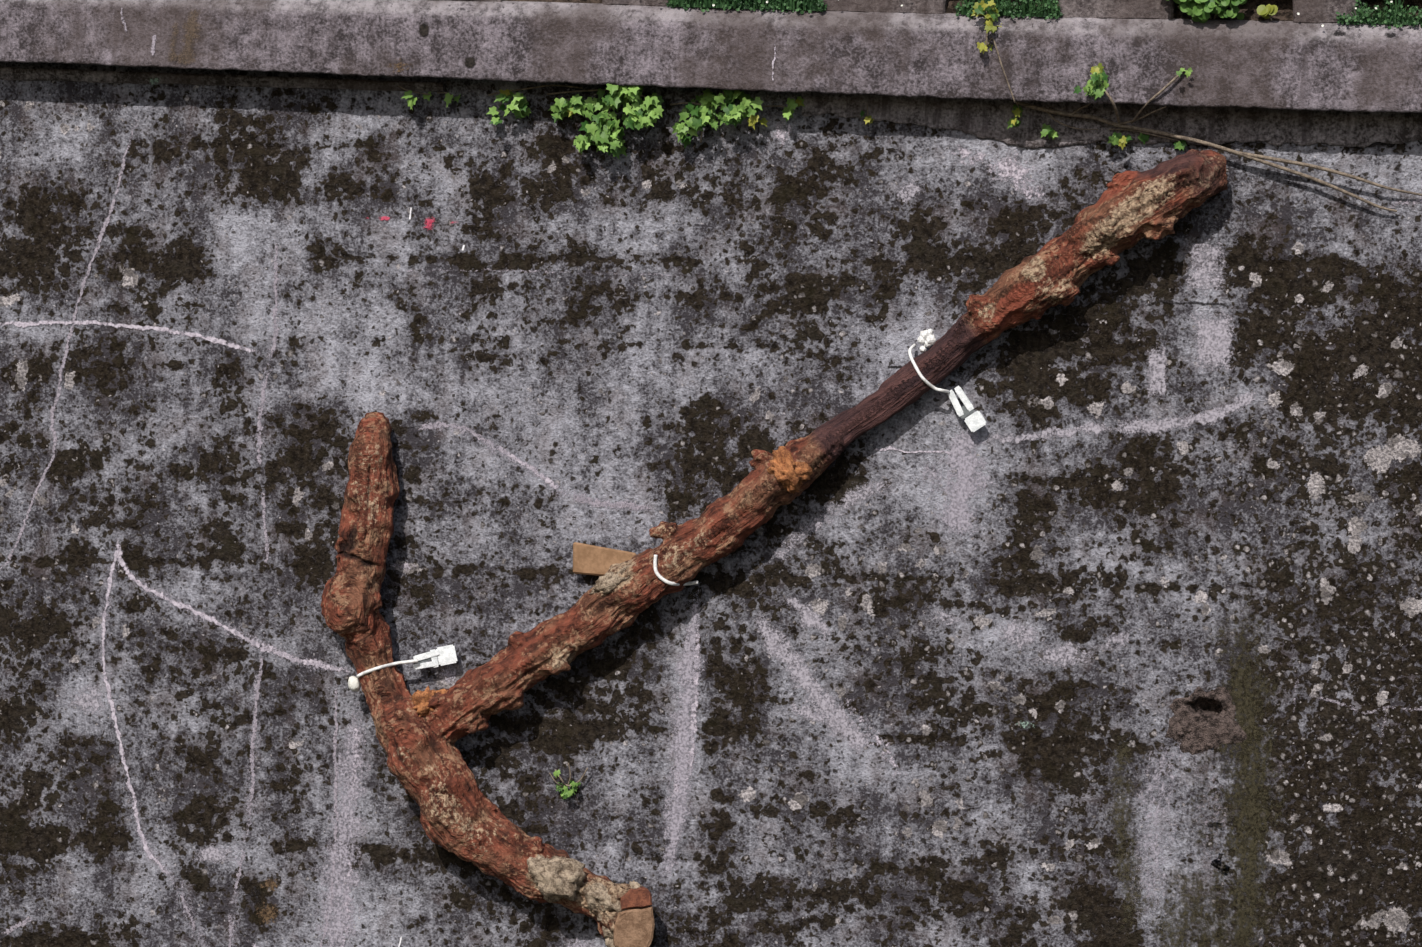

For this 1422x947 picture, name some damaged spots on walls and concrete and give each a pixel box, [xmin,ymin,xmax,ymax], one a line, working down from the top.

leakage [775,481,890,560]
leakage [923,393,1256,534]
leakage [317,712,370,947]
leakage [659,599,704,876]
leakage [787,598,830,640]
leakage [756,616,898,767]
leakage [1107,617,1282,947]
spalling [1165,686,1247,755]